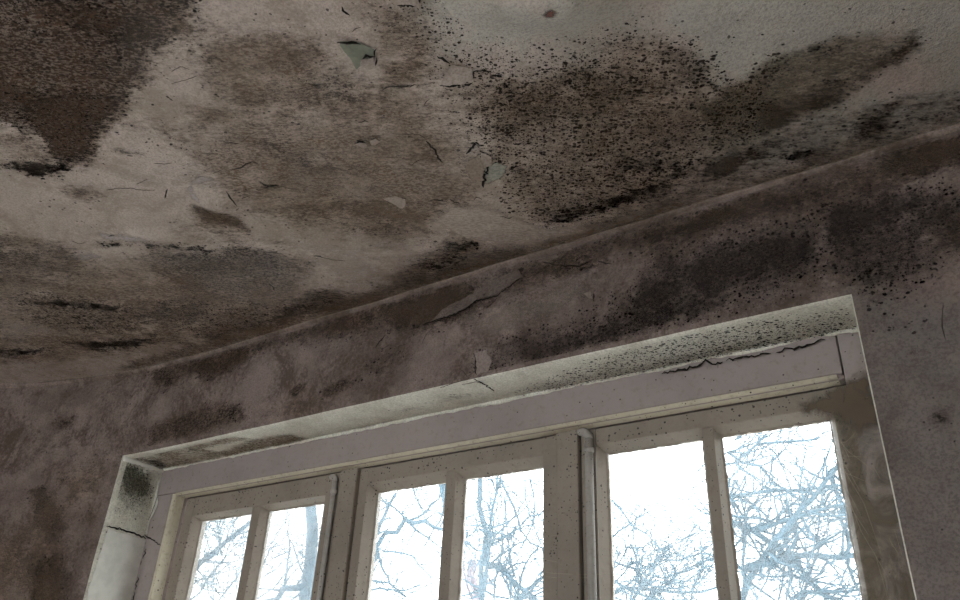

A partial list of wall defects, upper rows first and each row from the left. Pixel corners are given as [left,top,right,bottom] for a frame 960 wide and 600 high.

peeling [338,41,378,70]
leakage [0,0,960,400]
peeling [465,142,507,188]
peeling [423,270,523,325]
leakage [115,402,302,523]
crack [106,526,146,600]